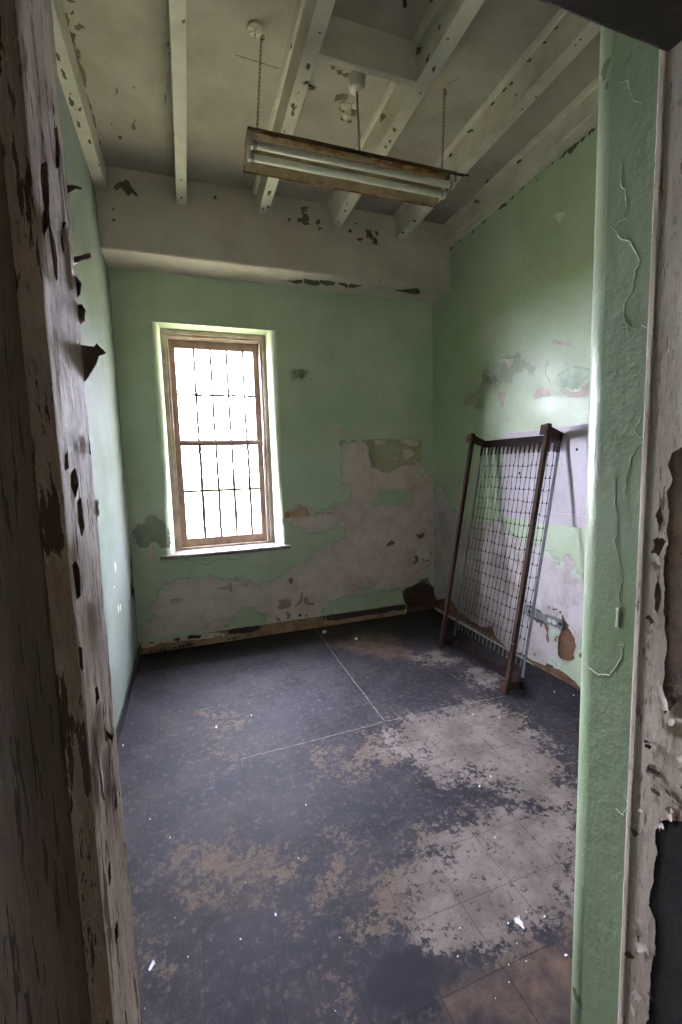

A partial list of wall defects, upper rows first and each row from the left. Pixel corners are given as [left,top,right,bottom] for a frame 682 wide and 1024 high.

peeling [65,0,101,146]
peeling [291,63,316,116]
peeling [41,87,91,325]
peeling [288,279,362,288]
crack [612,163,648,330]
peeling [81,343,106,381]
peeling [534,383,590,399]
peeling [65,450,100,599]
peeling [140,441,584,691]
peeling [646,447,682,736]
peeling [95,686,120,811]
peeling [623,736,682,1024]